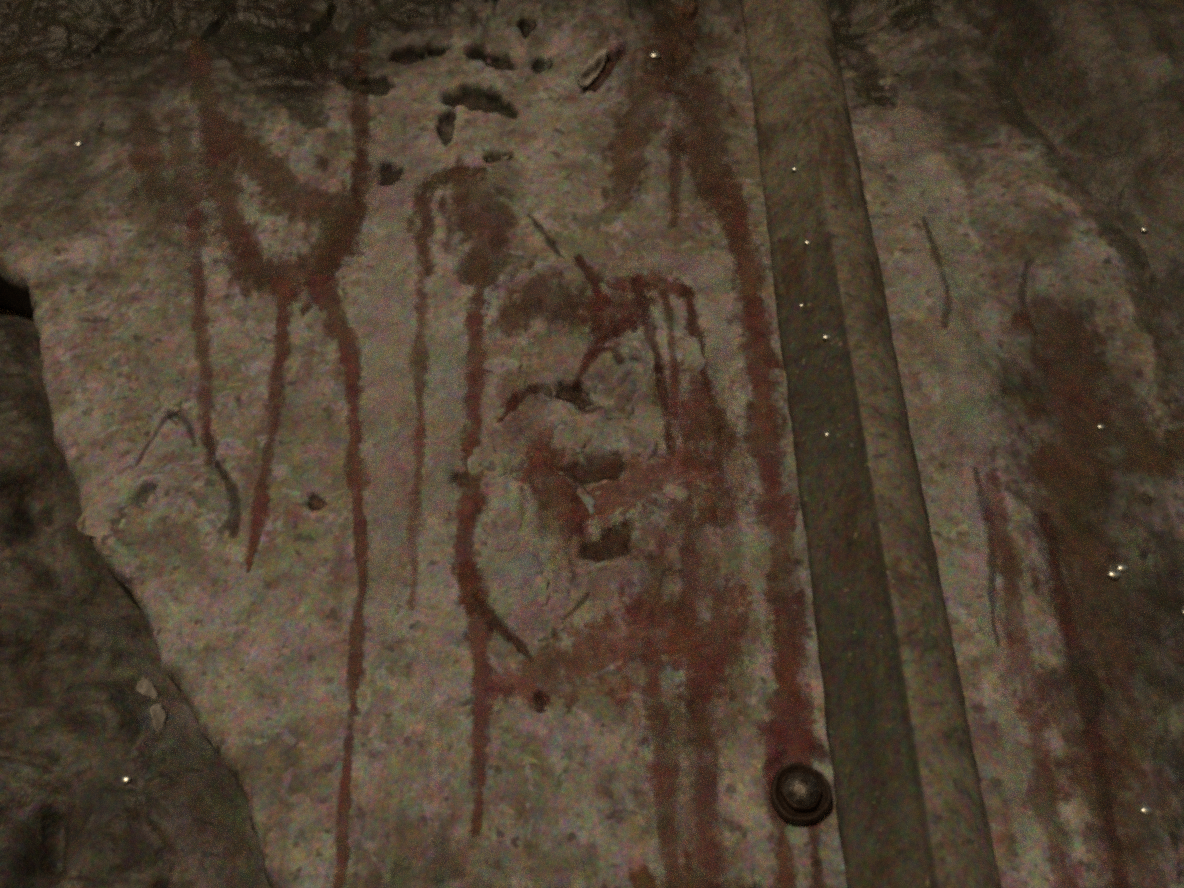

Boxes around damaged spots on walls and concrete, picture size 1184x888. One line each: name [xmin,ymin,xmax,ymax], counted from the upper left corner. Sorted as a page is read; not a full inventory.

rust [187,25,383,888]
rust [405,0,831,888]